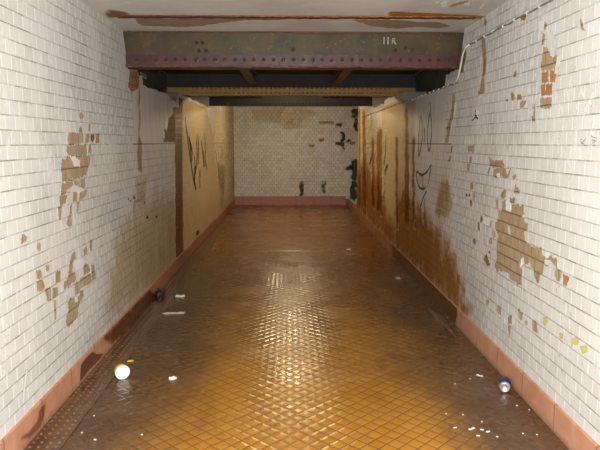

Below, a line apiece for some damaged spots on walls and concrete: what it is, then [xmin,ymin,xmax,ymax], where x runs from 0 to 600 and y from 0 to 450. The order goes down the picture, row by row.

peeling [506,20,562,122]
peeling [57,112,99,228]
peeling [478,156,570,287]
peeling [35,239,96,327]